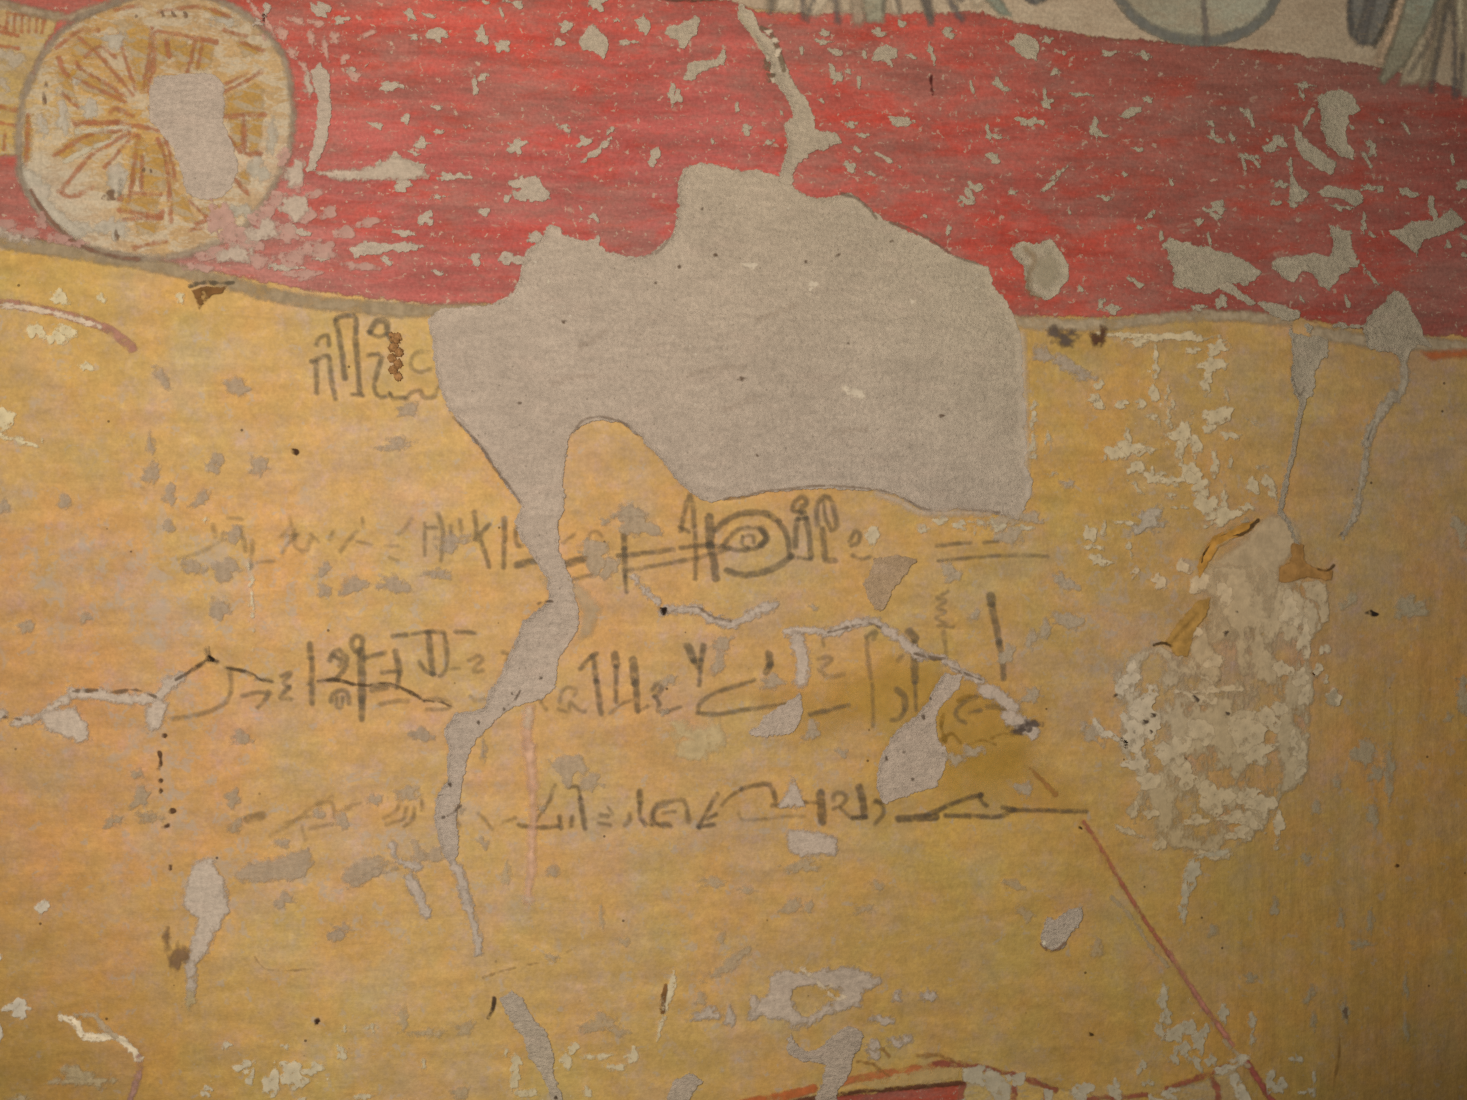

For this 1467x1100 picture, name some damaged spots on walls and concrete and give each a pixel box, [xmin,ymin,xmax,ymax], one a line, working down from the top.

flaking render [176,0,473,307]
peeling [27,323,77,344]
peeling [0,407,43,447]
flaking render [342,0,1467,923]
crack [1340,358,1409,540]
peeling [181,526,255,632]
crack [177,656,262,680]
crack [326,679,448,706]
crack [630,574,1040,741]
flaking render [183,839,314,1007]
peeling [232,1025,347,1100]
flaking render [690,934,912,1100]